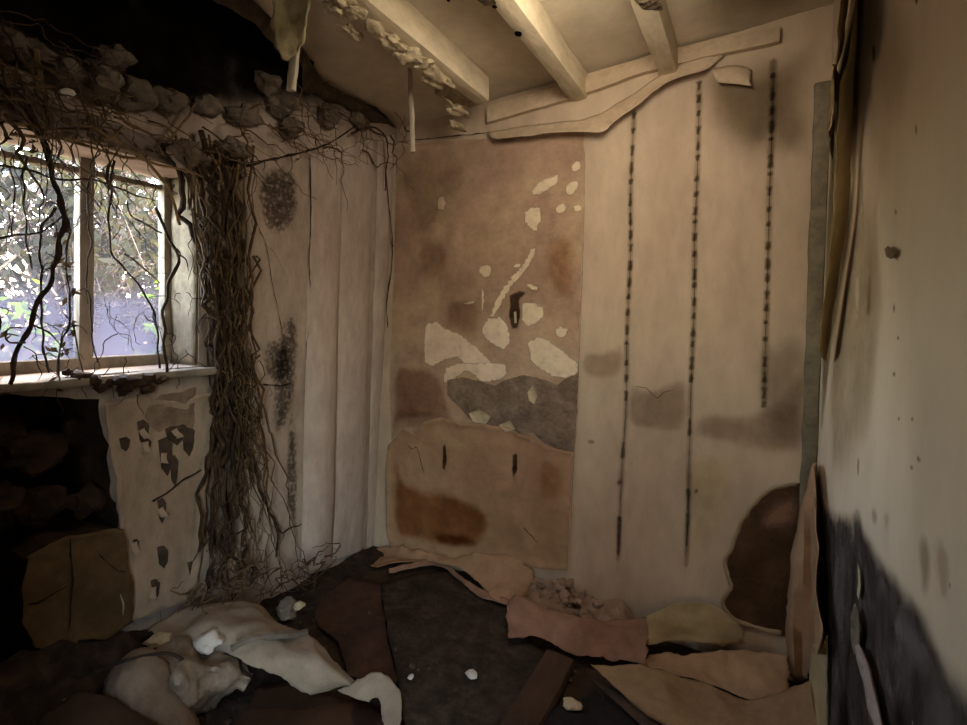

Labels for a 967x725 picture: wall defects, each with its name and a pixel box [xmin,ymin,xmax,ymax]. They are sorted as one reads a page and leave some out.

peeling [635,0,663,11]
flaking render [0,387,218,663]
leakage [263,172,295,227]
leakage [267,322,295,425]
leakage [288,432,296,514]
flaking render [270,0,585,452]
leakage [622,144,633,460]
leakage [688,145,699,440]
leakage [821,508,967,725]